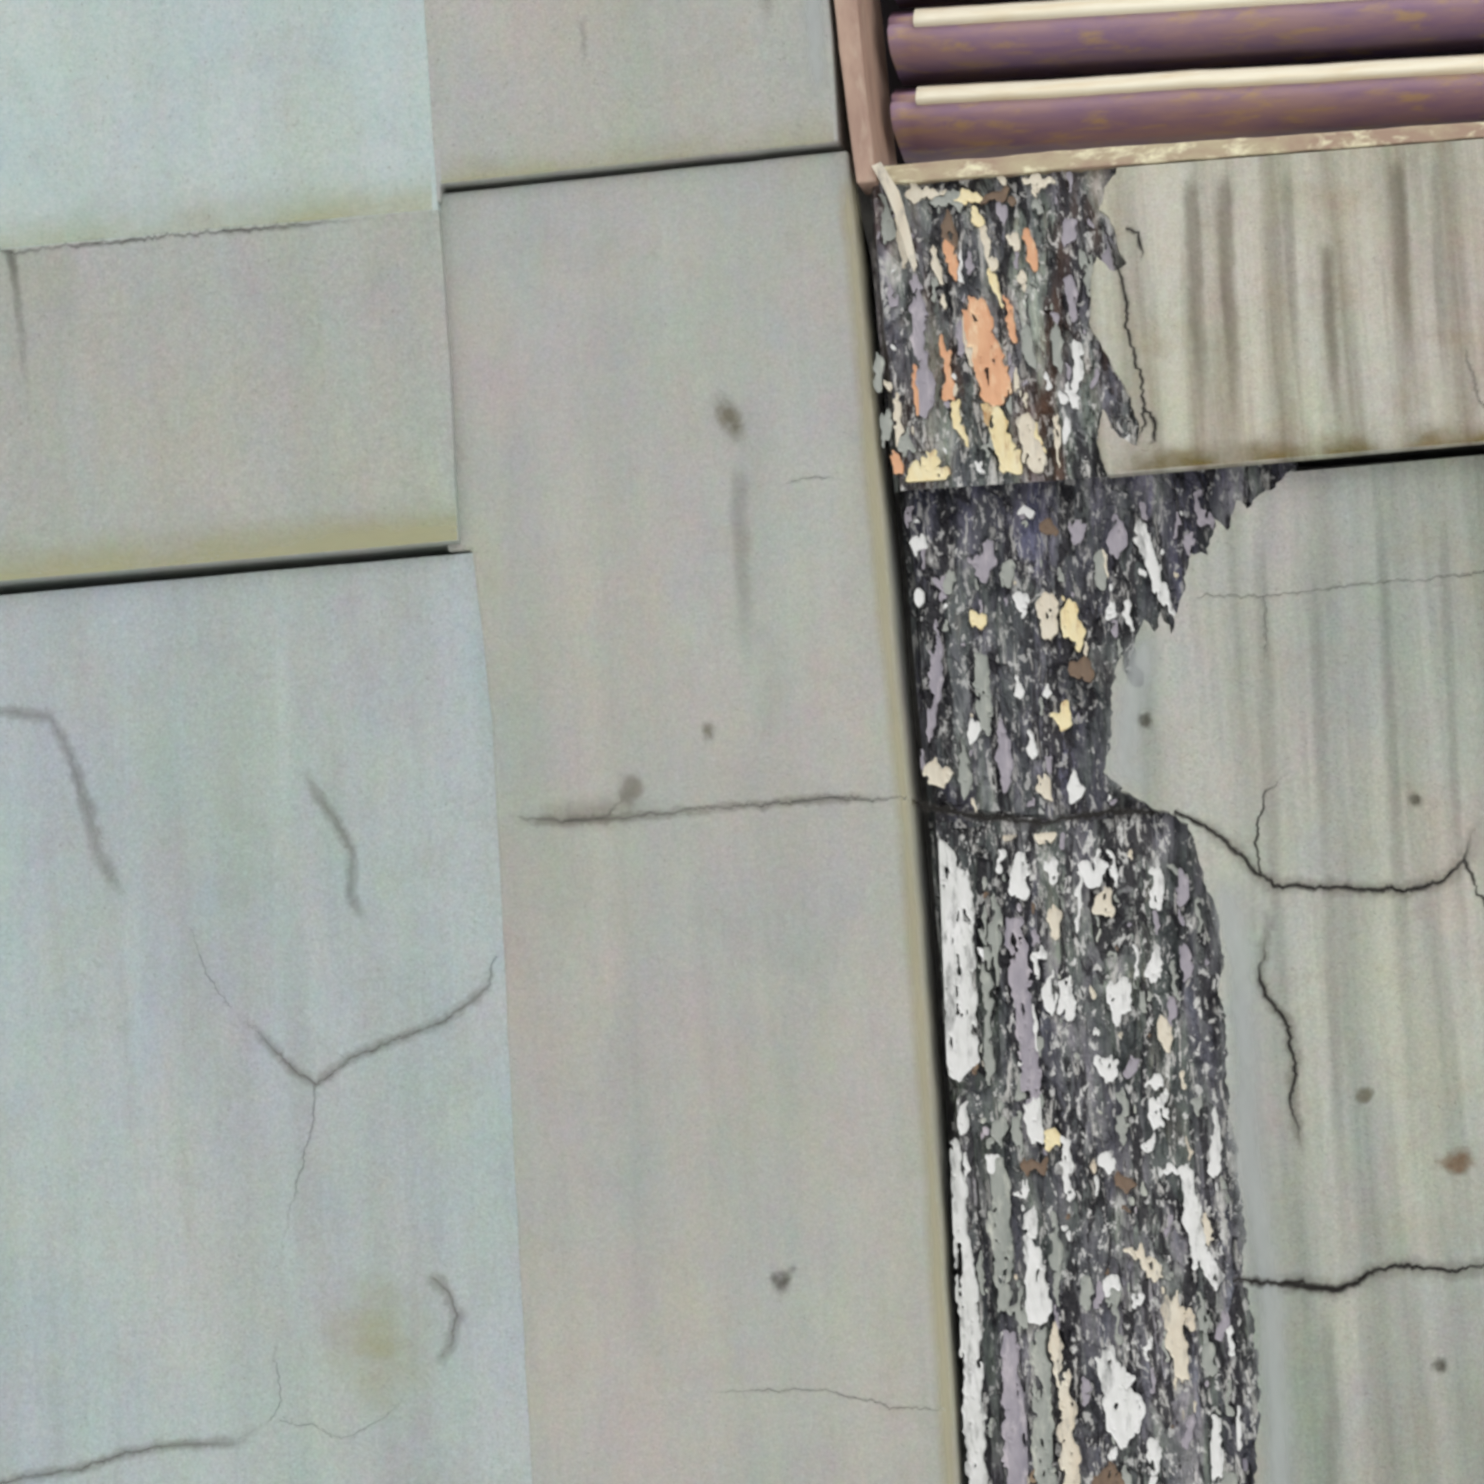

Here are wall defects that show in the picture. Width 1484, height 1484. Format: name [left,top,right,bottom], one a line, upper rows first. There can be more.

spalling [870,167,1298,1484]
crack [912,792,1484,900]
crack [1258,963,1298,1114]
crack [1232,1263,1482,1292]